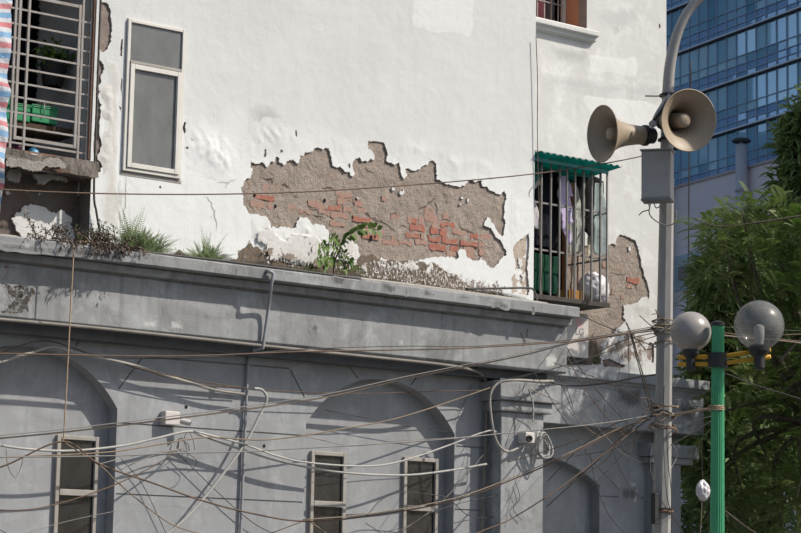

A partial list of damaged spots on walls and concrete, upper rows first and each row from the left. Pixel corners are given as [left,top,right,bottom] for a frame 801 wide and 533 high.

peeling [93,3,111,172]
spalling [5,157,68,186]
peeling [9,204,75,240]
peeling [241,141,528,295]
leakage [0,271,129,317]
peeling [567,235,653,368]